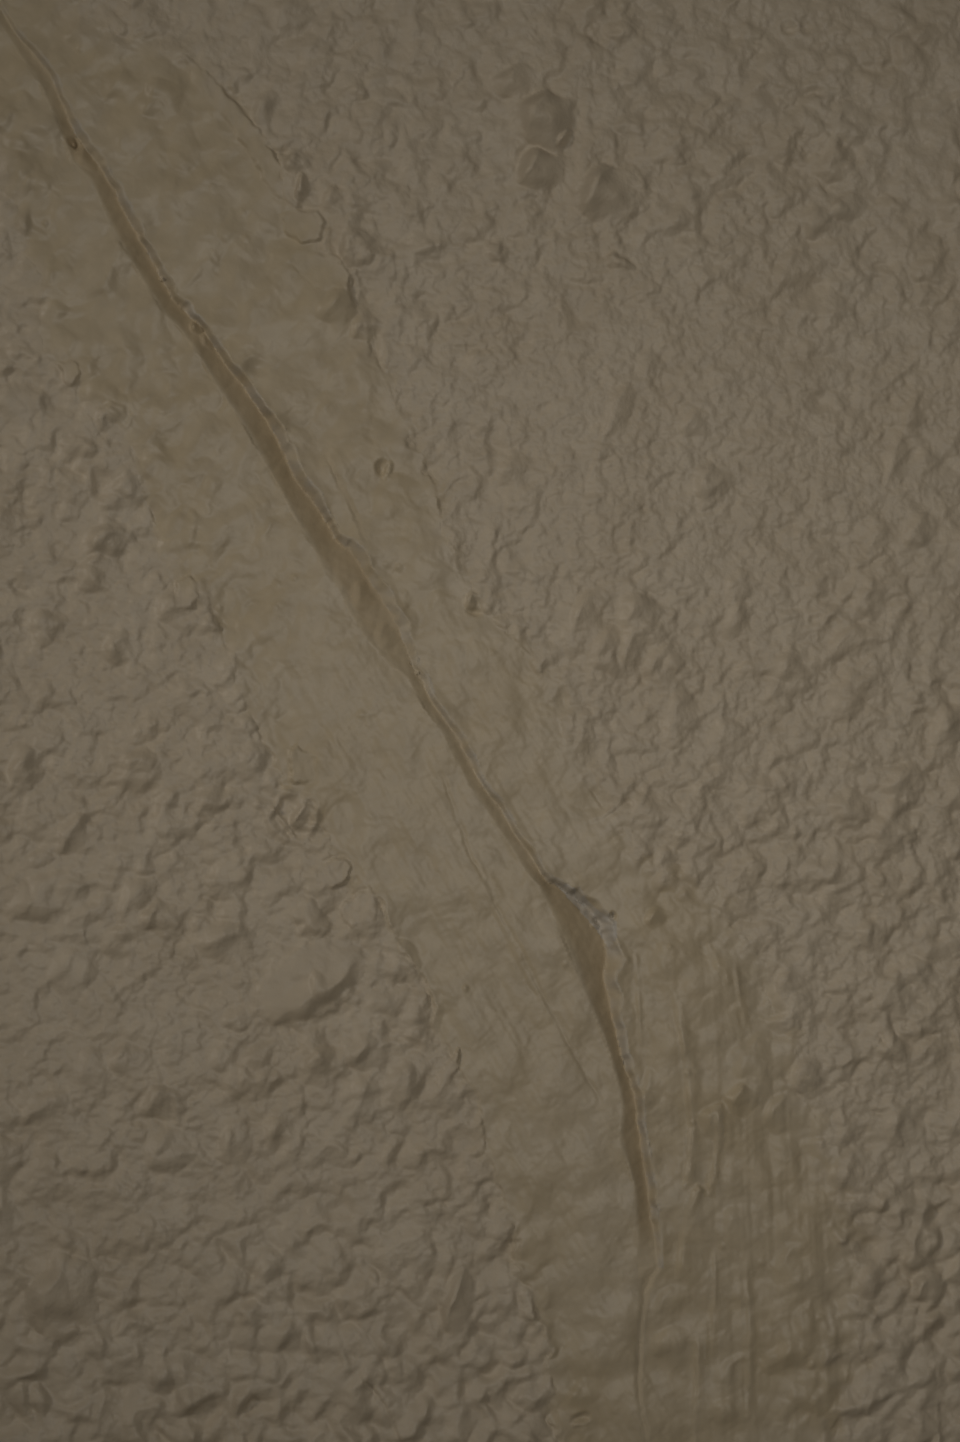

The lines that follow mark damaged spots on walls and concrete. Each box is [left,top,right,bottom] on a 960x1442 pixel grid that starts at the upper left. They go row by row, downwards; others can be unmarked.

crack [0,0,663,1442]